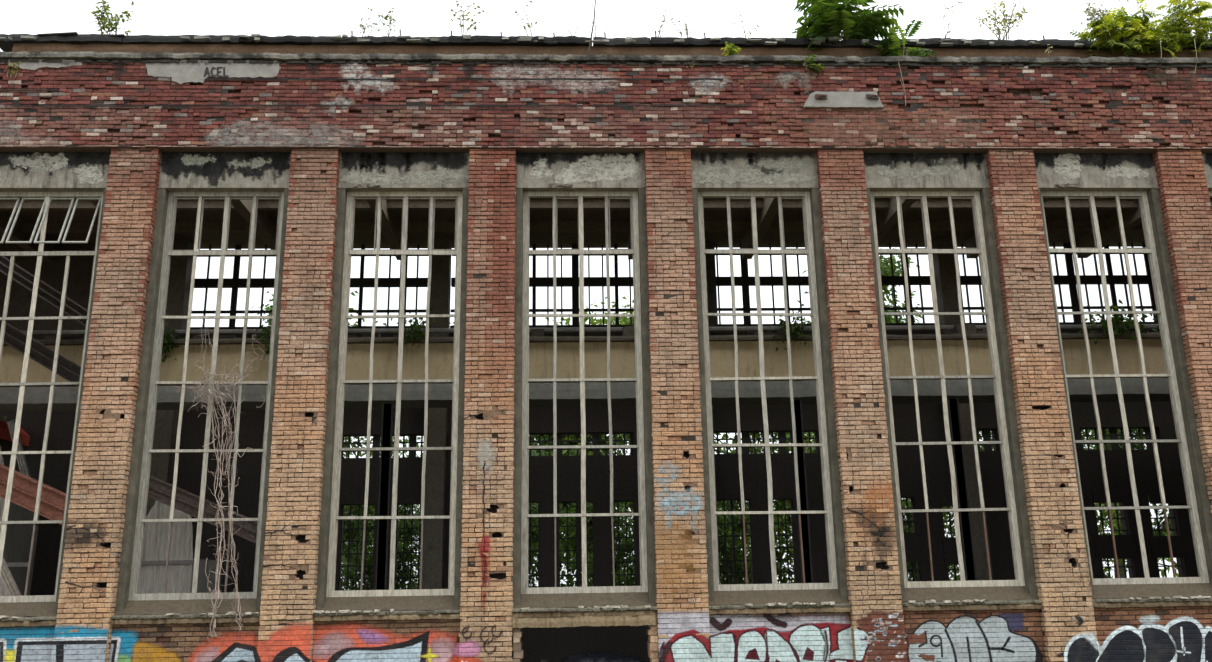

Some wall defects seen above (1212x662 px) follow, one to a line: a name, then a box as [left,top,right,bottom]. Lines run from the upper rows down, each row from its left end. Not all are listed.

peeling [0,152,105,185]
peeling [1054,153,1084,188]
peeling [1105,164,1149,179]
peeling [856,599,985,662]